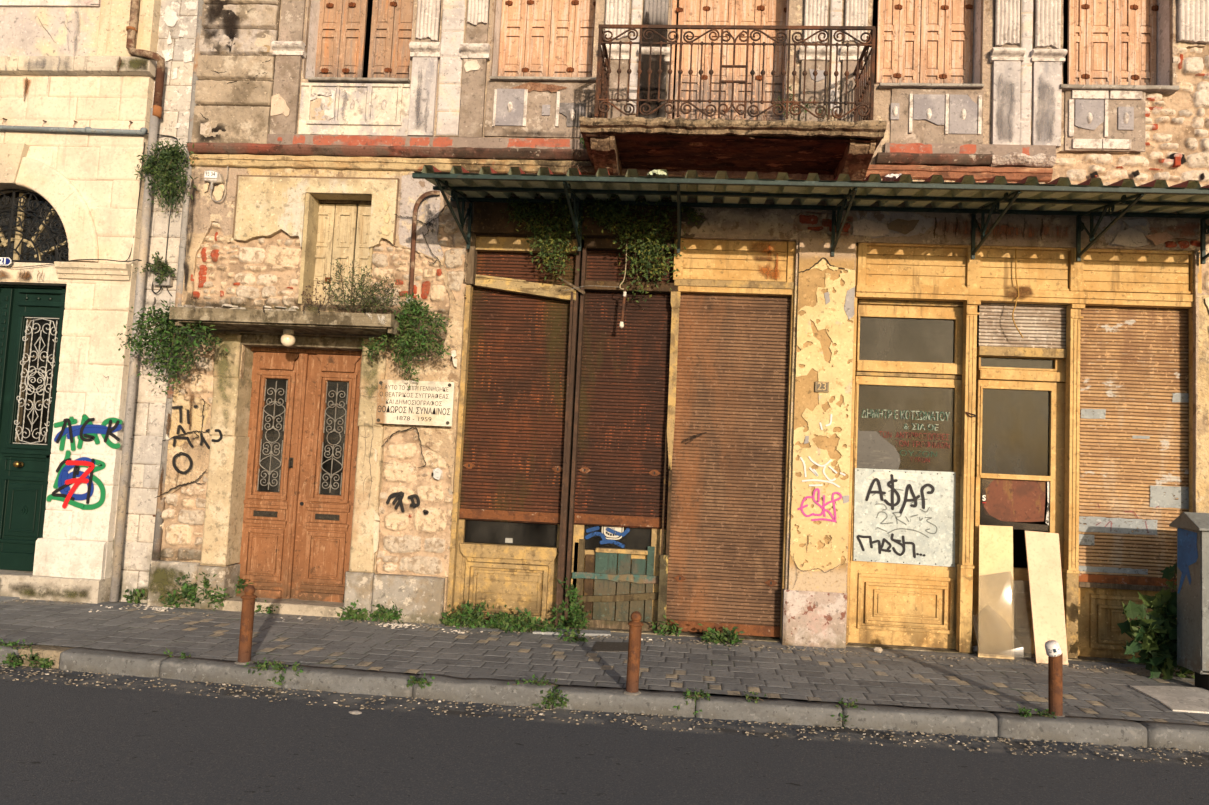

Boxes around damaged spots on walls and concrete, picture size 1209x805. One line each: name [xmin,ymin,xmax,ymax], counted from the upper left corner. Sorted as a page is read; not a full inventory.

leakage [206,0,239,52]
spalling [189,222,302,311]
rust [753,243,779,280]
peeling [790,259,855,571]